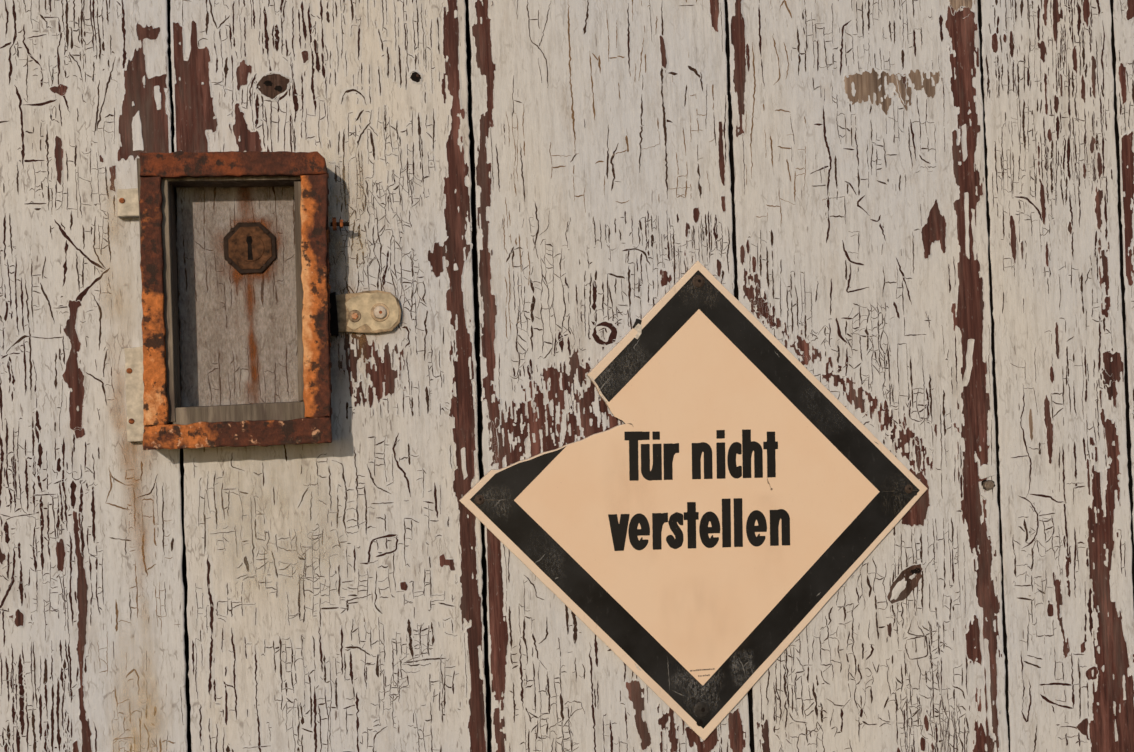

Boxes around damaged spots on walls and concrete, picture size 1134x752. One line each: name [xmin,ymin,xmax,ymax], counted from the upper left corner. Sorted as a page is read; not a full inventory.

peeling [99,20,270,194]
peeling [62,300,86,440]
crack [0,0,469,752]
rust [232,266,270,311]
rust [249,334,258,391]
peeling [427,0,625,752]
crack [489,0,1134,752]
peeling [738,238,937,528]
peeling [842,0,1016,752]
peeling [55,510,93,752]
peeling [625,678,771,752]
peeling [1046,350,1134,752]